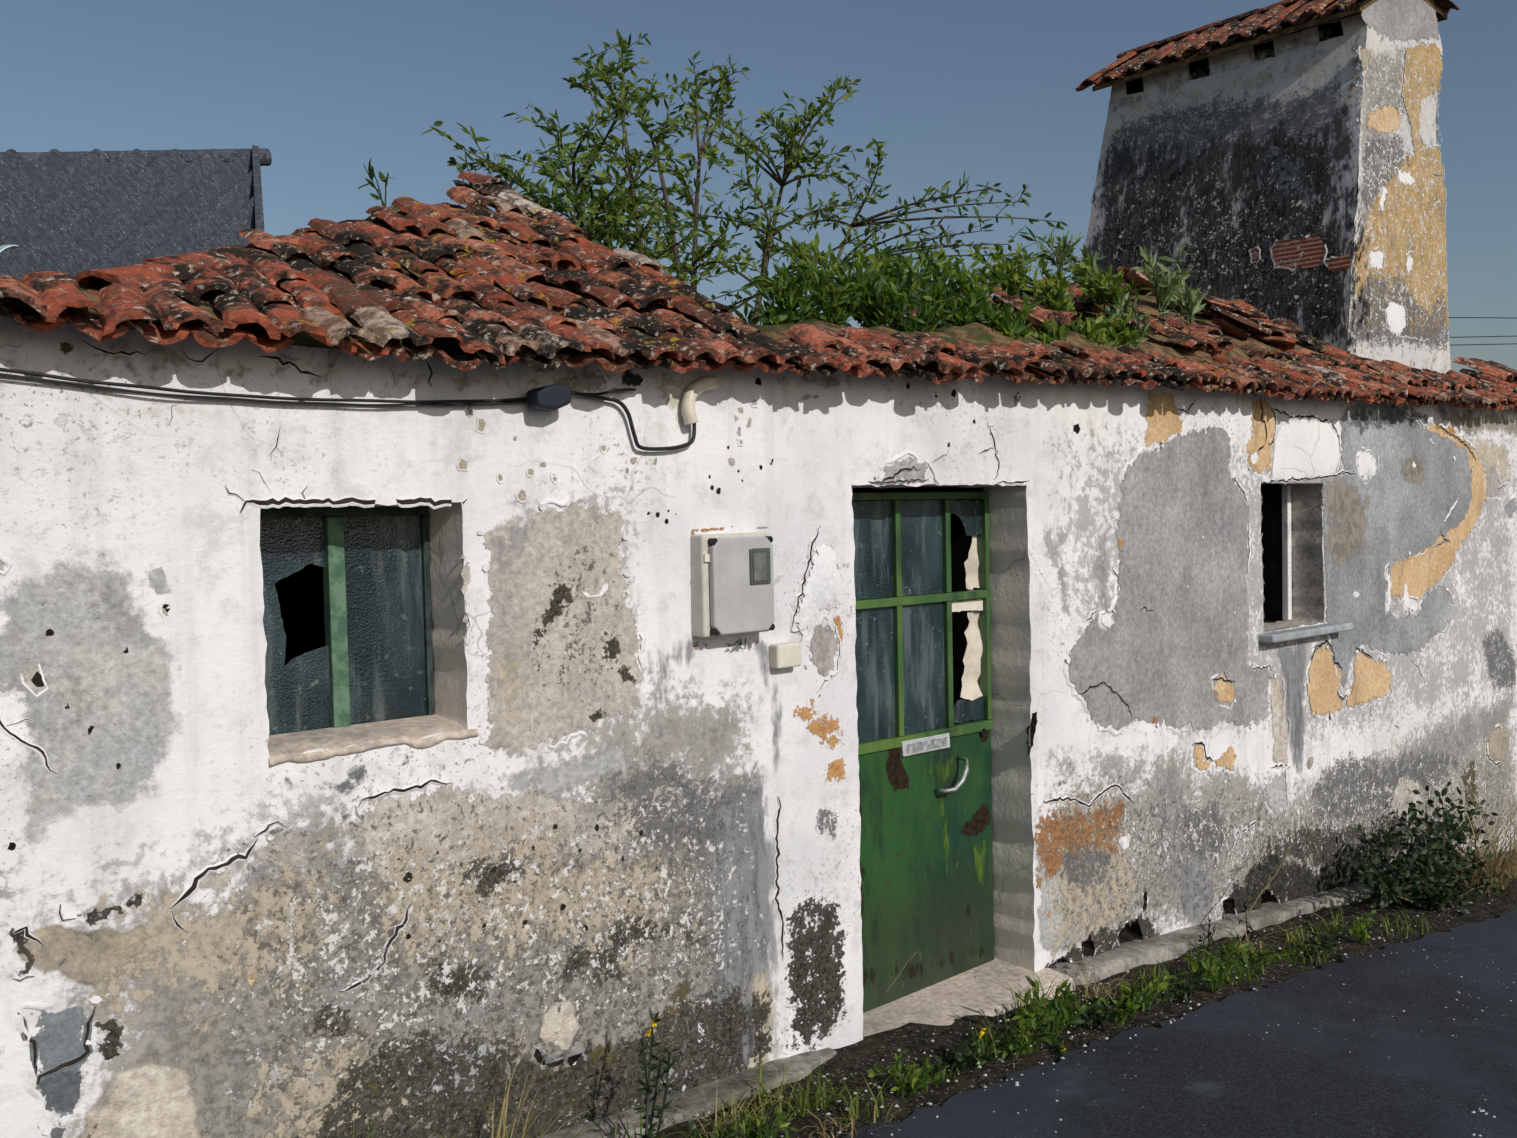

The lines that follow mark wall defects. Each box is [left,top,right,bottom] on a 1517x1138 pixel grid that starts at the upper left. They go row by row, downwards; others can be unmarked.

water stain [1087,47,1449,353]
water stain [8,928,35,976]
flaking render [15,924,201,1138]
crack [170,820,285,933]
water stain [69,487,848,1138]
flaking render [357,462,684,946]
crack [790,525,821,643]
corrosion [794,698,846,784]
corrosion [1033,799,1127,888]
crack [1031,783,1137,810]
flaking render [1064,388,1291,817]
flaking render [1306,402,1517,721]